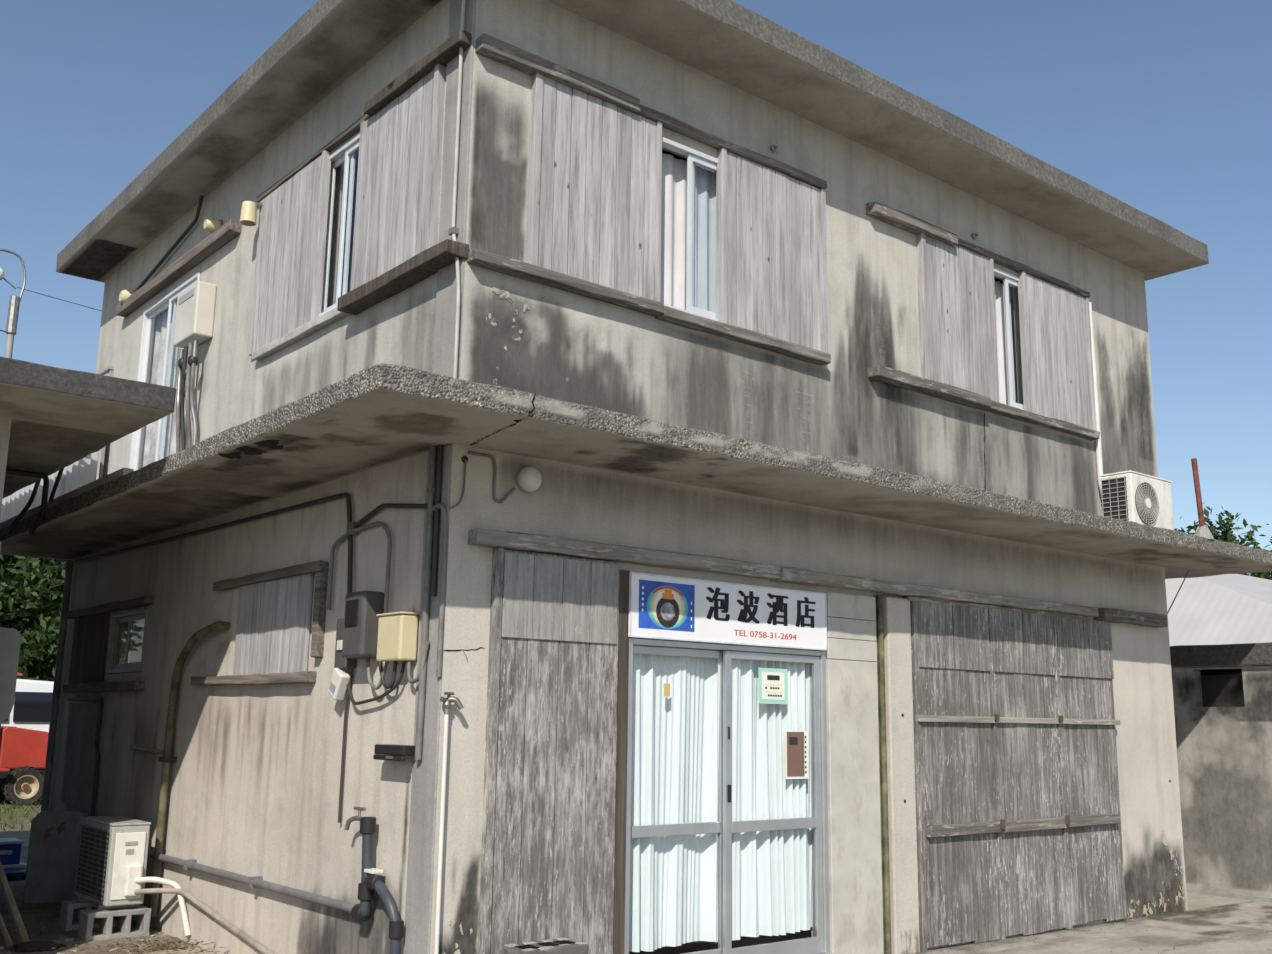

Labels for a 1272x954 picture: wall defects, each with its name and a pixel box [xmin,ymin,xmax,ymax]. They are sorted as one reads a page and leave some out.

crack [470,393,536,446]
flaking render [491,286,529,350]
leakage [472,294,641,417]
leakage [608,441,684,473]
leakage [680,337,731,436]
leakage [746,354,819,454]
leakage [835,273,935,480]
leakage [1024,426,1037,501]
leakage [1070,380,1153,514]
flaking render [1125,836,1187,919]
flaking render [443,919,473,954]